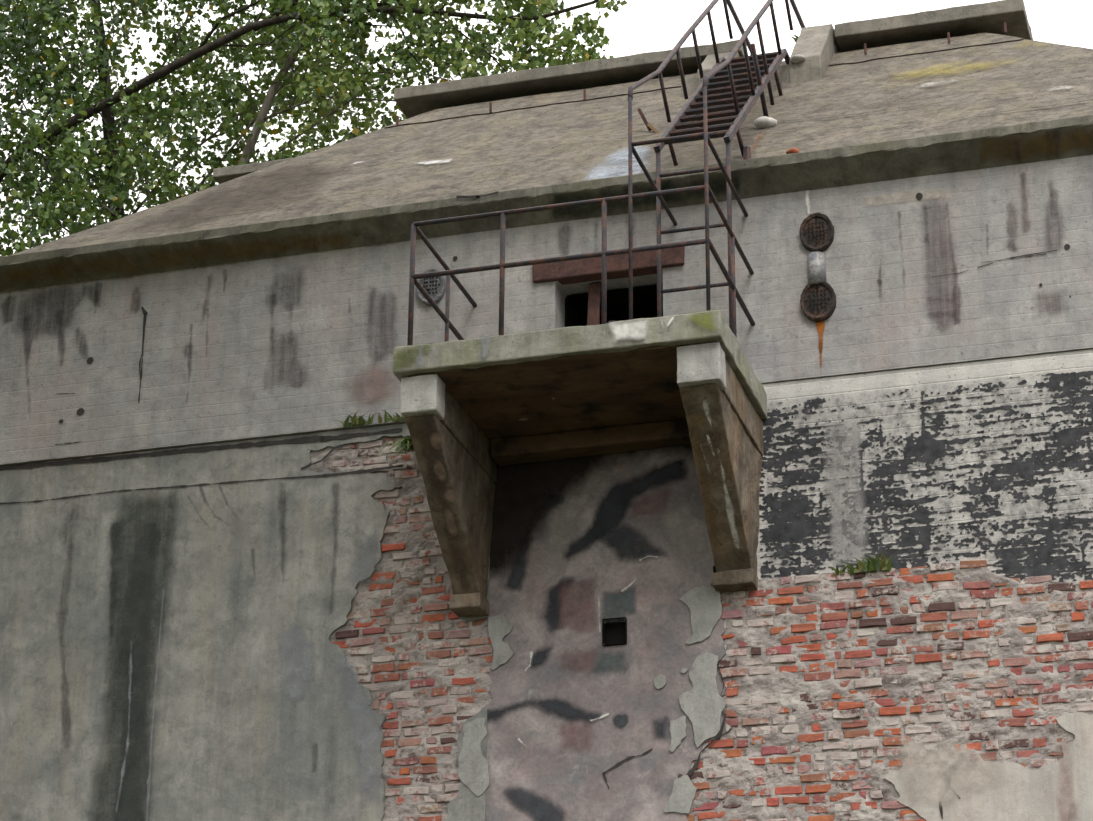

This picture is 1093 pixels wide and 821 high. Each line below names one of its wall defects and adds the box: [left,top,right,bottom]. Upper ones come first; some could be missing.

damp [3,283,102,360]
damp [96,496,174,821]
crack [0,428,403,504]
flaking render [309,437,514,821]
corrosion [816,320,824,365]
flaking render [664,371,1093,821]